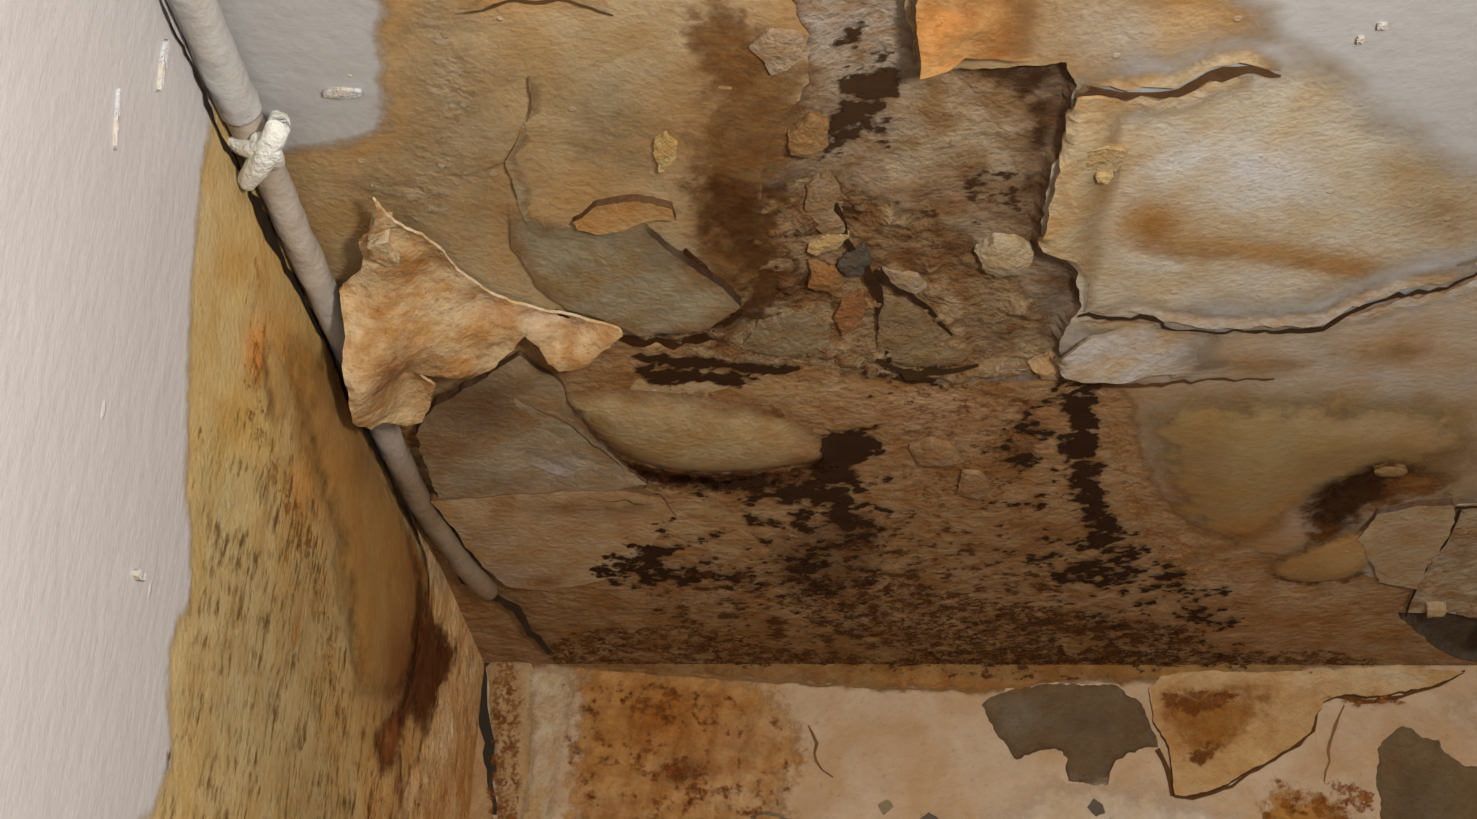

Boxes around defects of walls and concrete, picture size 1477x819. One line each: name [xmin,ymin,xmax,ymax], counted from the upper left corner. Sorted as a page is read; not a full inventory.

crack [456,0,613,16]
damp [904,0,921,68]
damp [953,0,1273,87]
crack [1074,49,1281,113]
damp [284,0,831,397]
crack [1078,259,1477,334]
peeling [339,0,1477,819]
damp [589,68,1477,680]
crack [1080,378,1275,388]
damp [149,103,436,819]
rust [565,666,803,819]
rust [1263,780,1374,819]